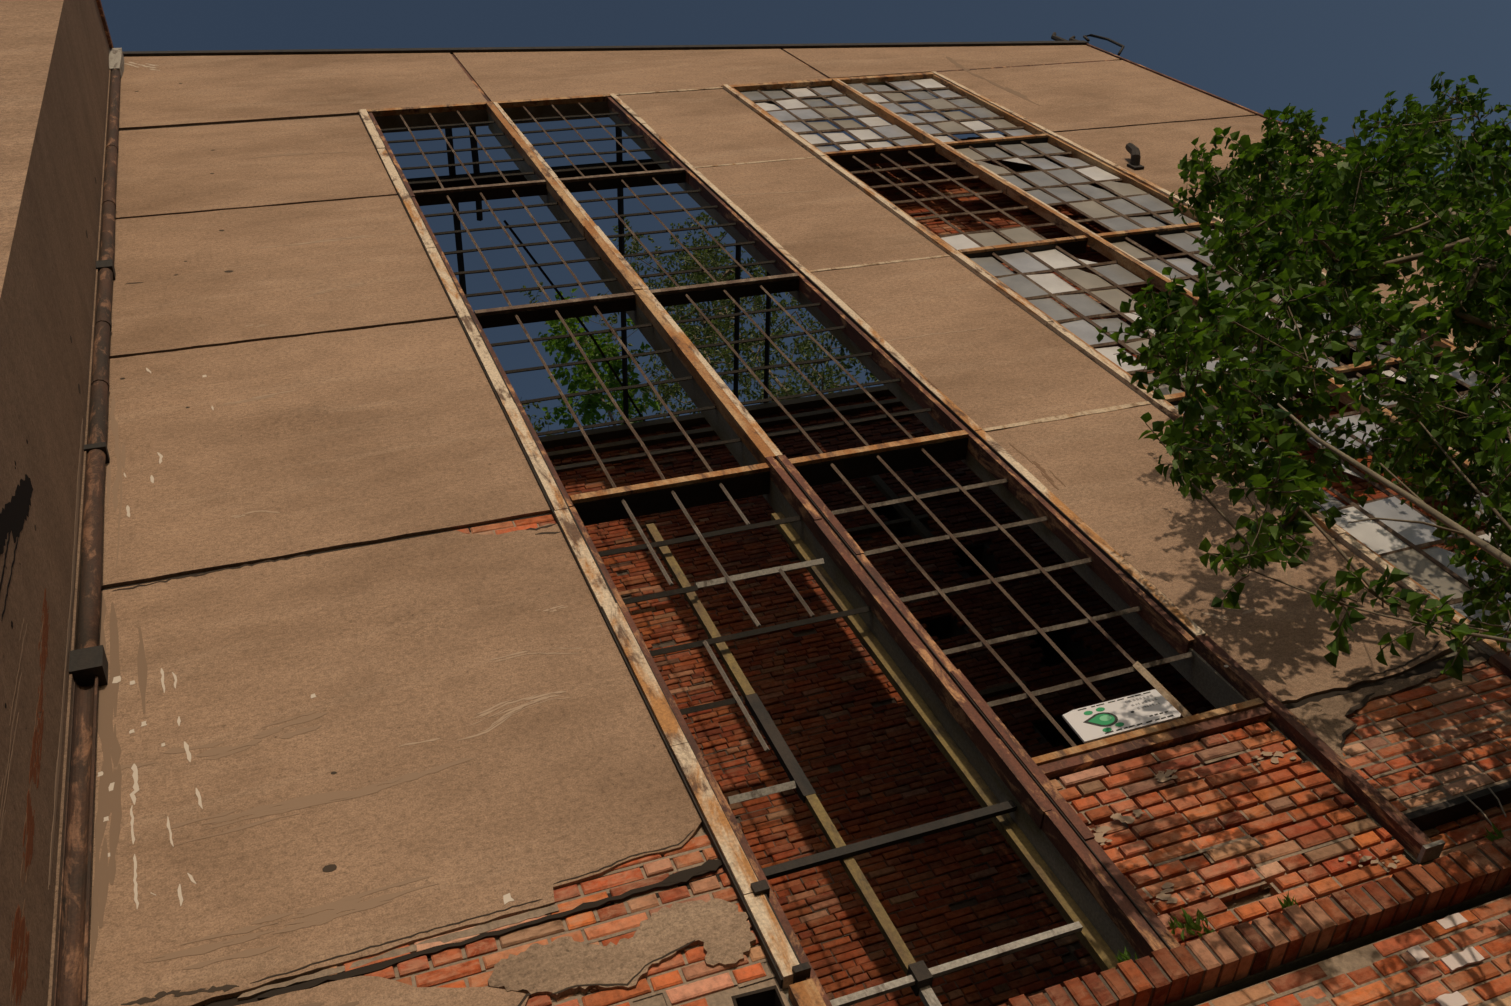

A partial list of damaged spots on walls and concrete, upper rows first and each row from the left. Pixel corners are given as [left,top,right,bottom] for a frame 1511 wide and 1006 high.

crack [1340,640,1441,748]
spalling [1341,662,1511,814]
crack [252,830,723,1006]
spalling [327,826,790,1006]